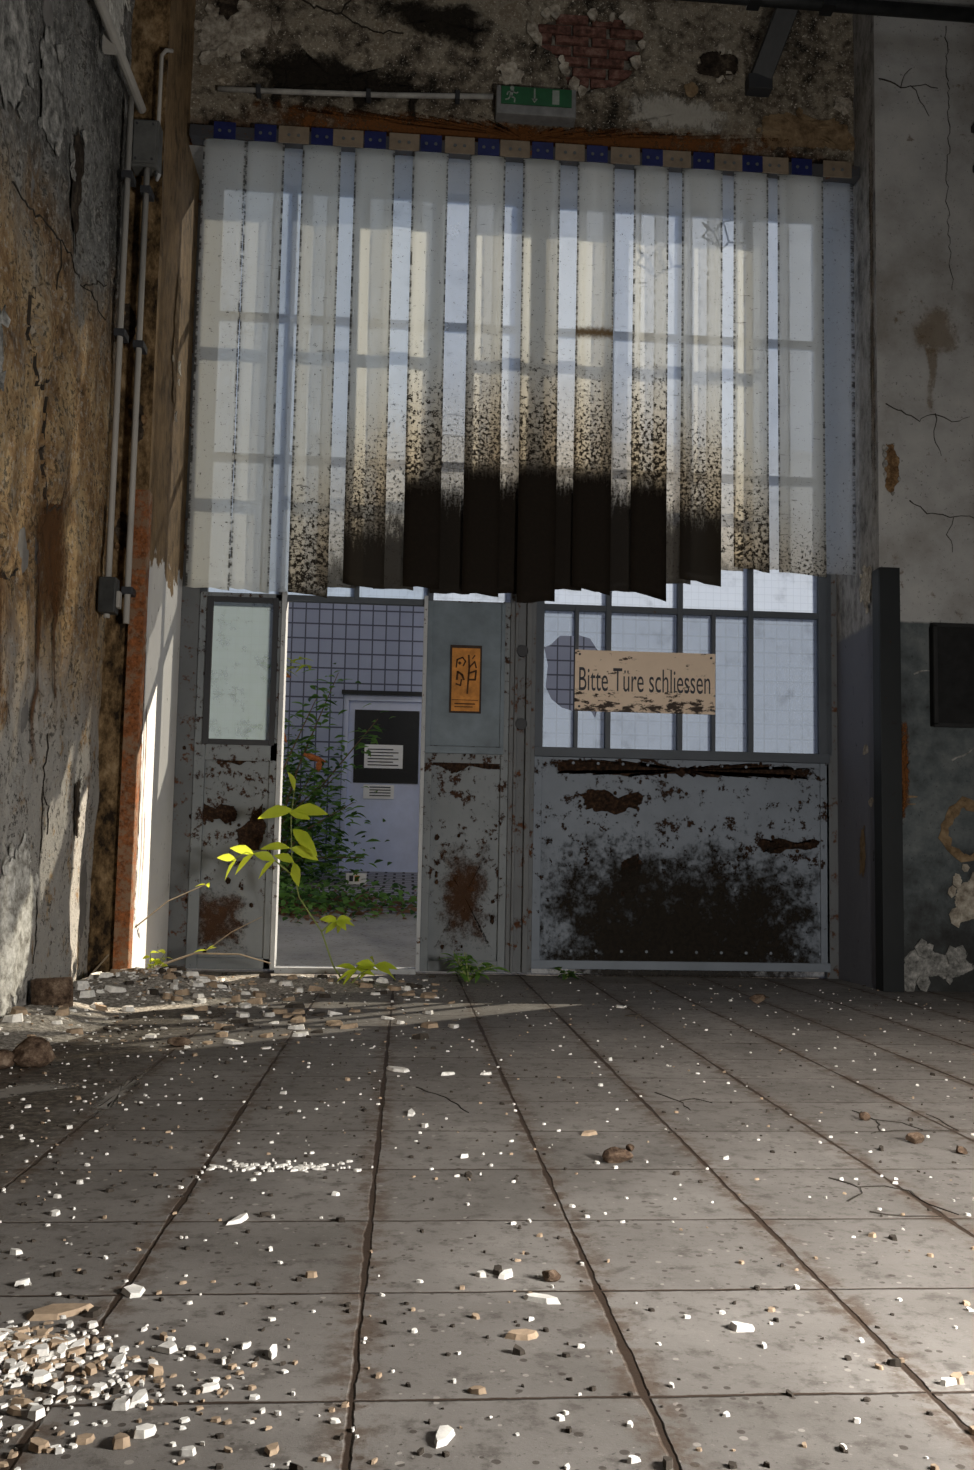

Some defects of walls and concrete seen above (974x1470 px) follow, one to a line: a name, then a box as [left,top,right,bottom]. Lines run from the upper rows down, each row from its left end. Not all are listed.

peeling [0,0,91,257]
damp [347,74,369,113]
damp [407,90,421,120]
flaking render [527,4,646,96]
spalling [684,42,742,97]
crack [879,26,954,285]
crack [12,181,107,320]
peeling [0,305,11,391]
crack [886,403,968,456]
peeling [904,864,974,992]